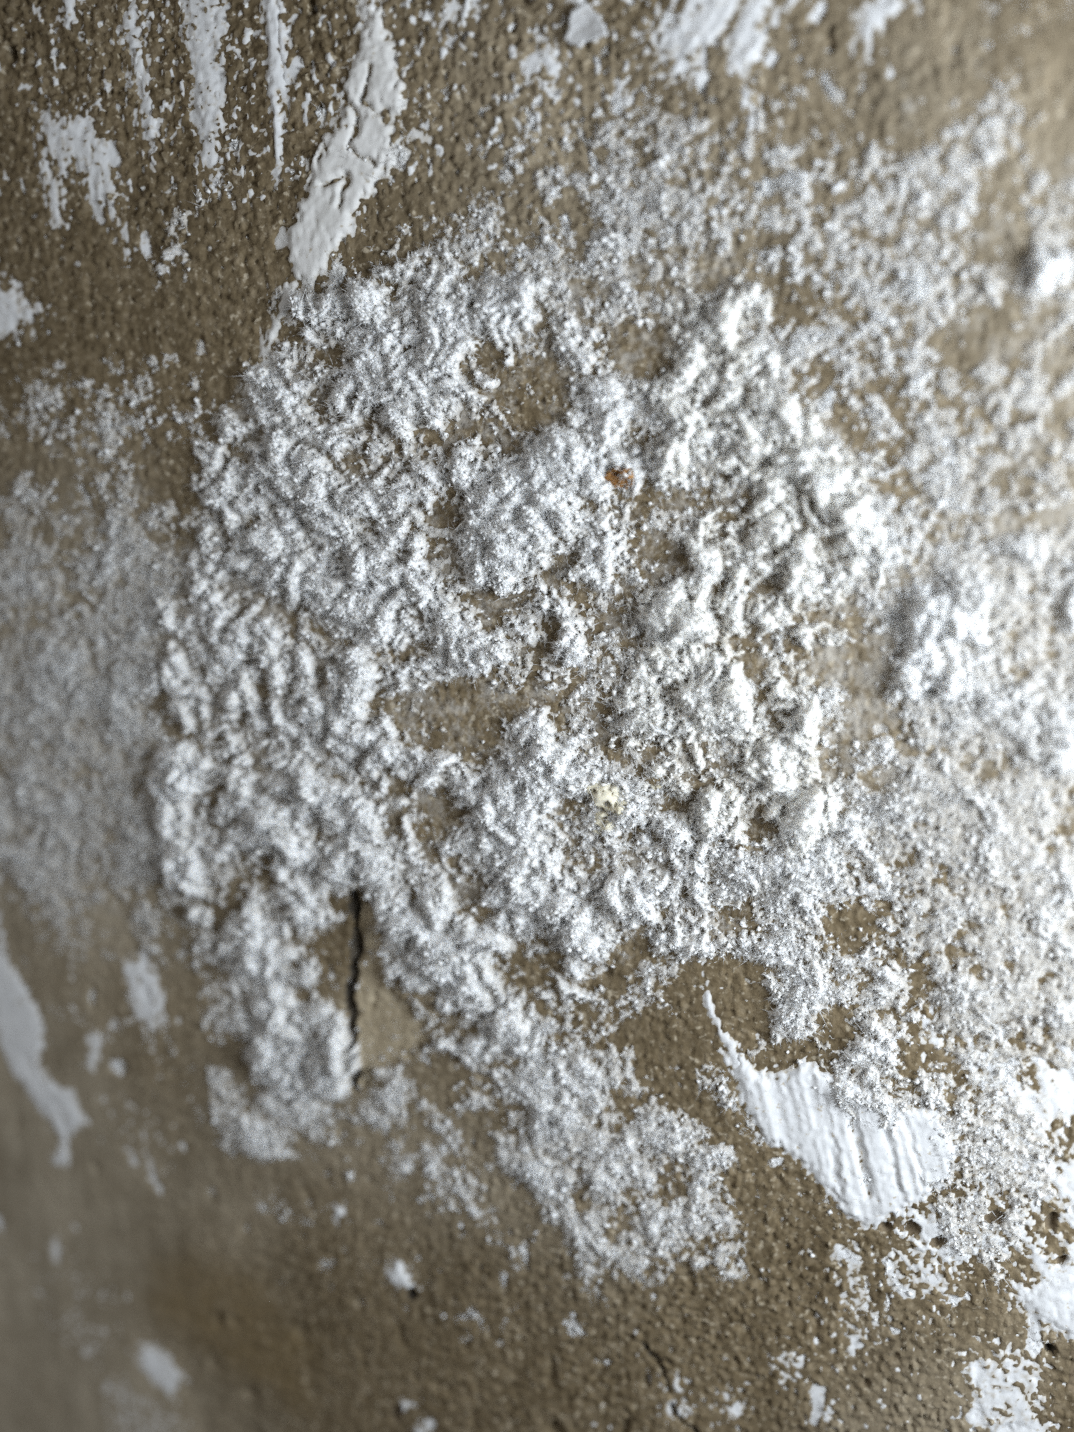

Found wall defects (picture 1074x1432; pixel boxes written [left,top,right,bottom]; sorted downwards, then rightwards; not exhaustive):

peeling [515,0,608,105]
peeling [602,0,925,132]
leakage [760,29,866,115]
leakage [339,131,410,180]
leakage [128,138,253,291]
peeling [31,0,481,398]
peeling [0,272,58,343]
leakage [693,1062,748,1116]
peeling [879,985,1074,1432]
leakage [430,1296,519,1346]
leakage [555,1311,587,1343]
leakage [863,1257,971,1341]